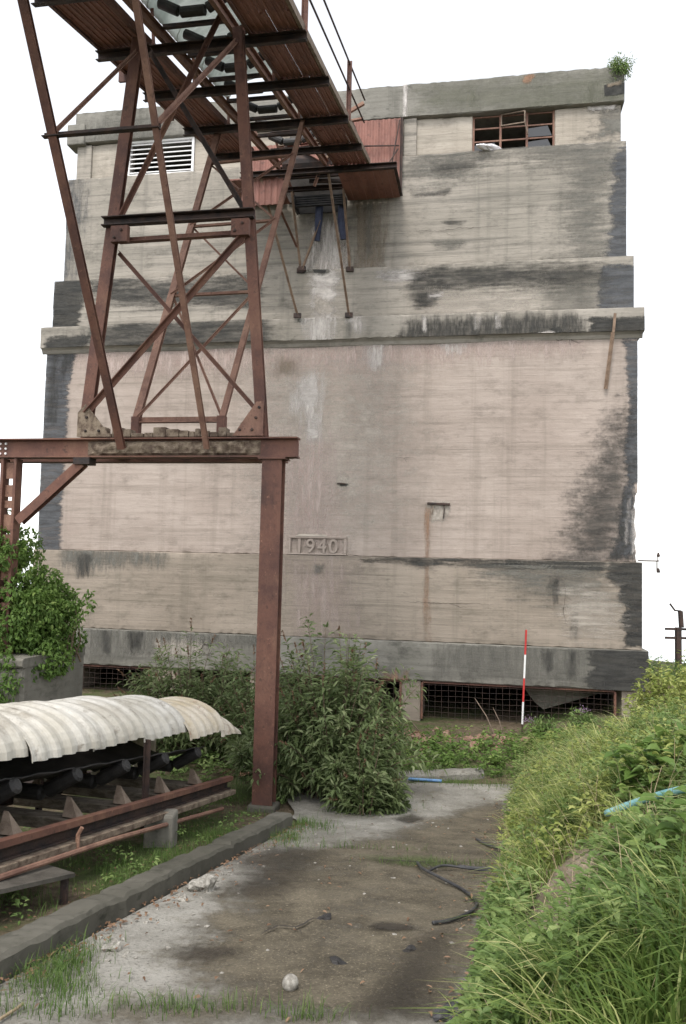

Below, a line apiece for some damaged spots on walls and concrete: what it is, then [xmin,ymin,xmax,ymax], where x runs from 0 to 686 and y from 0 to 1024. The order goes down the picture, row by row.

damp [43,179,99,438]
damp [37,463,166,575]
damp [82,141,649,692]